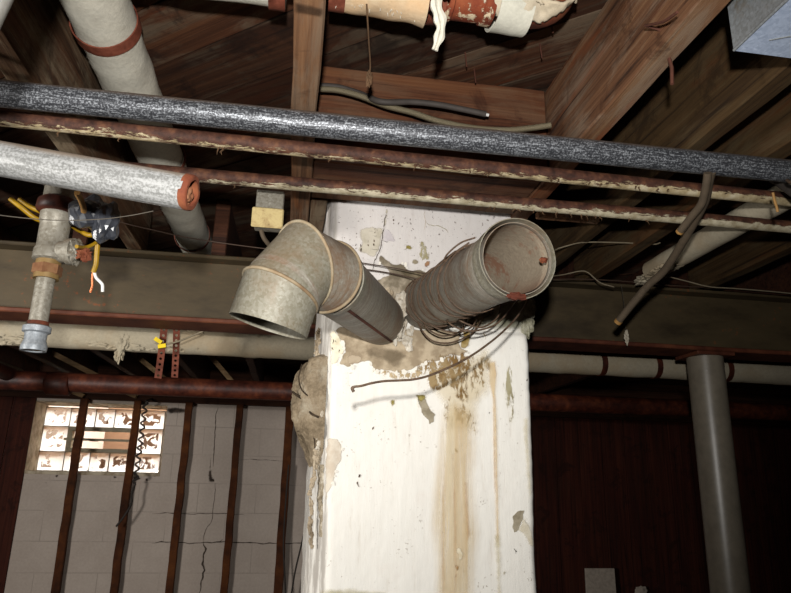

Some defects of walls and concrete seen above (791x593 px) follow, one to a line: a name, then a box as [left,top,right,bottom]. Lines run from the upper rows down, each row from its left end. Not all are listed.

peeling [355,215,427,298]
peeling [336,327,467,376]
peeling [416,395,475,431]
leakage [418,353,487,426]
peeling [471,358,490,388]
crack [154,489,293,593]
spalling [307,439,343,549]
peeling [513,511,533,546]